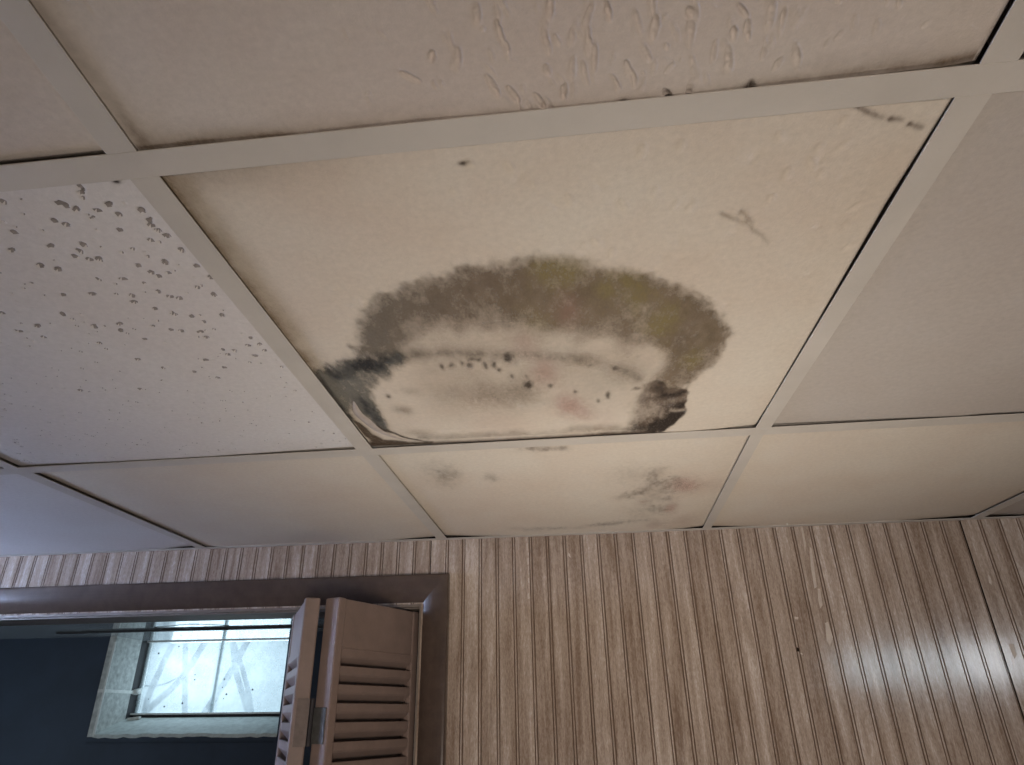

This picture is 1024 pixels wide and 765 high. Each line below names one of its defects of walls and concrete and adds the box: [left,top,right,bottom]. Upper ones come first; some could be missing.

damp [160,176,228,261]
damp [240,278,289,340]
damp [298,259,729,446]